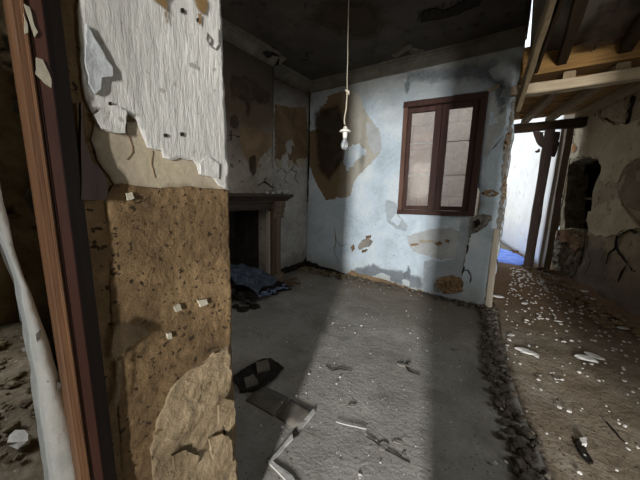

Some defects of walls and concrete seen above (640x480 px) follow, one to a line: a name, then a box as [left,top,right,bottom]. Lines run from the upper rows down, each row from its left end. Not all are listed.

spalling [76,0,382,480]
crack [258,92,311,202]
peeling [346,96,516,298]
crack [461,221,490,288]
peeling [552,110,640,278]
crack [605,229,638,282]